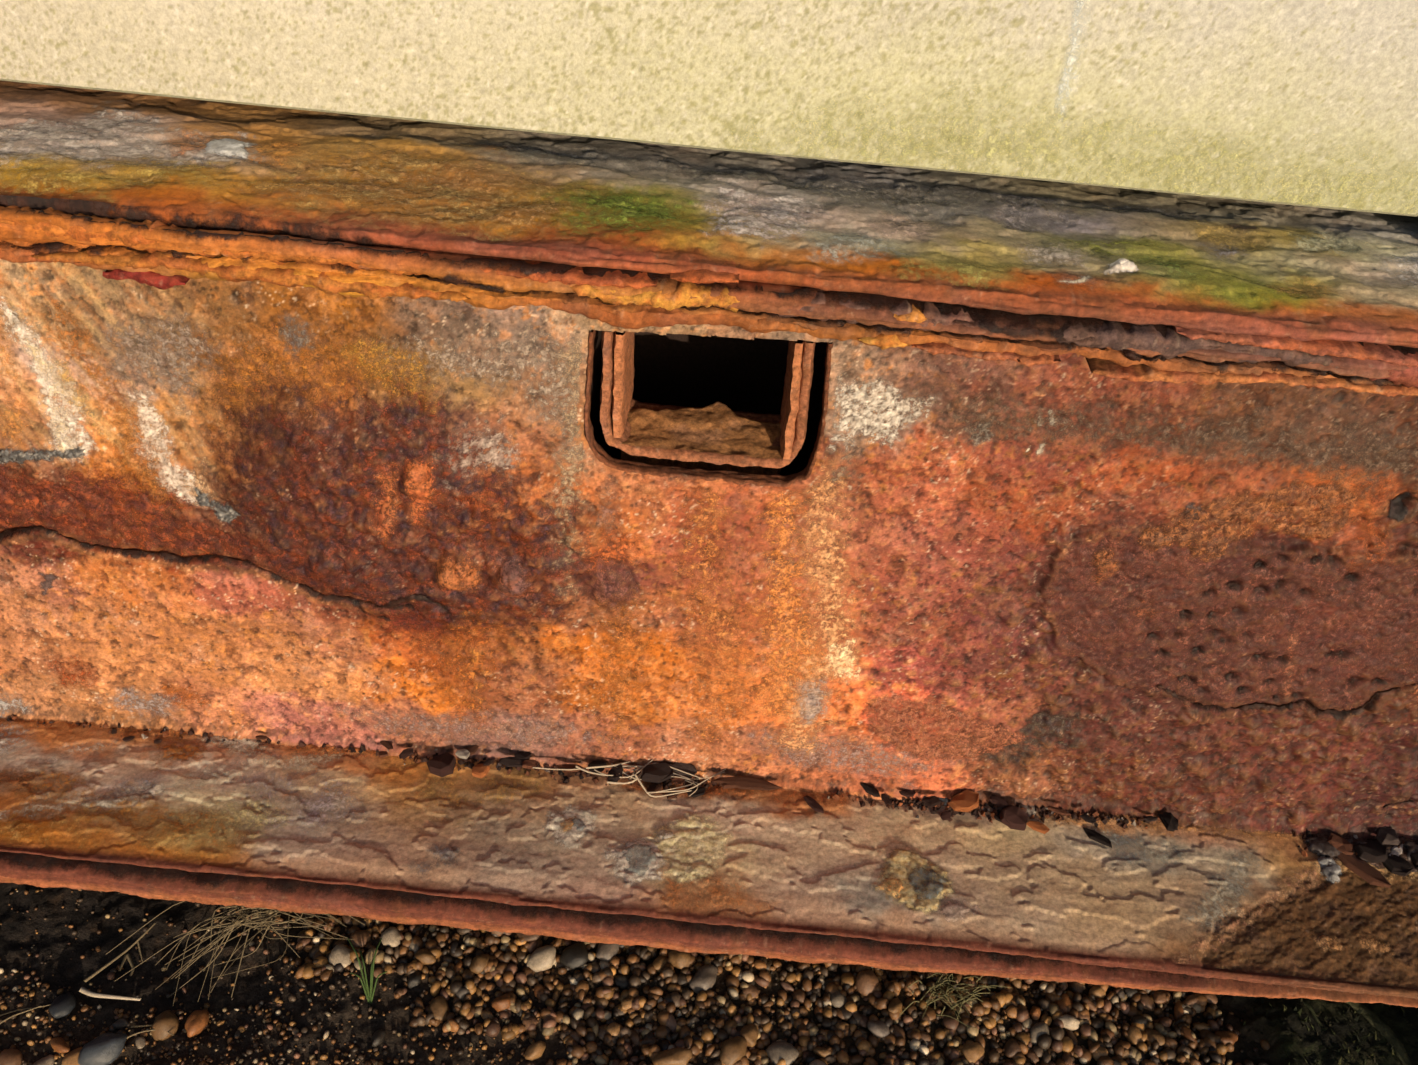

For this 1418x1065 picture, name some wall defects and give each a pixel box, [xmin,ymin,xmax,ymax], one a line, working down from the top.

rust [0,133,470,302]
rust [250,139,1269,249]
rust [481,258,740,313]
rust [778,289,1418,397]
rust [0,304,435,606]
rust [916,383,1418,564]
crack [0,525,451,621]
rust [0,717,414,764]
rust [557,761,951,821]
rust [994,805,1297,928]
peeling [1178,833,1418,982]
rust [1296,827,1418,888]